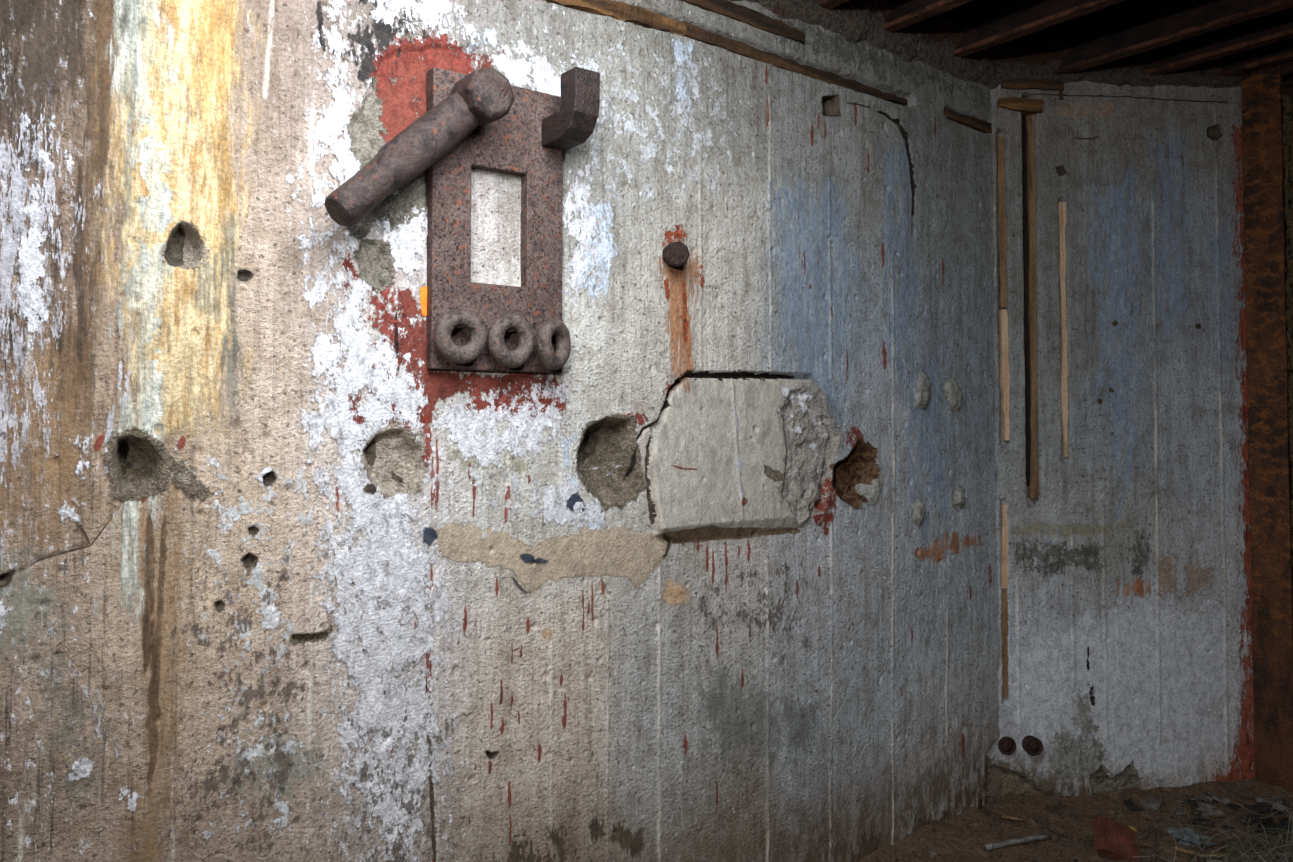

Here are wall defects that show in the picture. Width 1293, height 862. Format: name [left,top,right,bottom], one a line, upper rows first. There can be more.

crack [846,102,916,216]
water stain [0,0,252,489]
peeling [334,171,569,498]
rust [660,224,704,391]
water stain [59,498,86,523]
crack [27,504,122,568]
spalling [94,426,213,503]
spalling [566,407,648,513]
spalling [776,379,884,539]
rust [1212,124,1256,782]
water stain [0,599,13,634]
water stain [112,492,176,811]